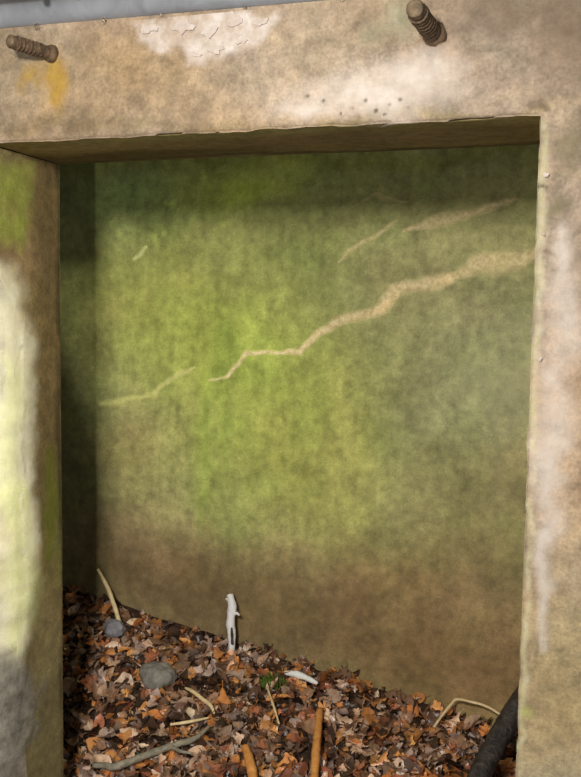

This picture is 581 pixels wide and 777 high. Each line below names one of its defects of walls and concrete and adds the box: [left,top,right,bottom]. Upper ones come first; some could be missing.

flaking render [140,11,277,64]
crack [209,253,534,381]
crack [100,367,195,405]